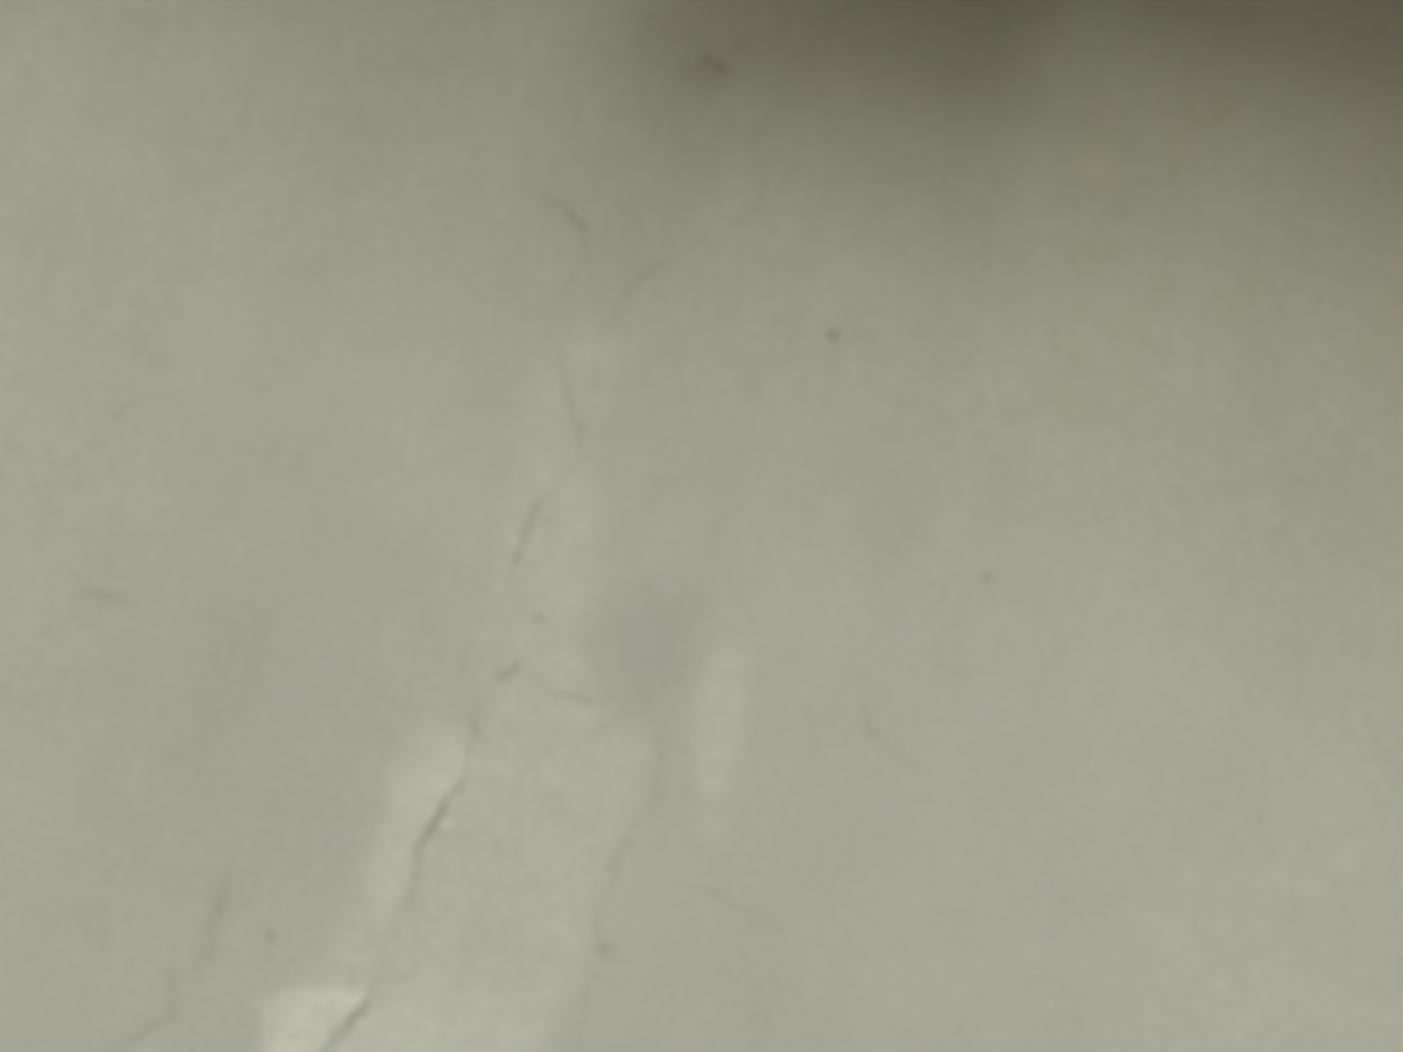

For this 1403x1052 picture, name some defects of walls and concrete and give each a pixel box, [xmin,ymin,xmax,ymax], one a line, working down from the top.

peeling [248,983,378,1052]